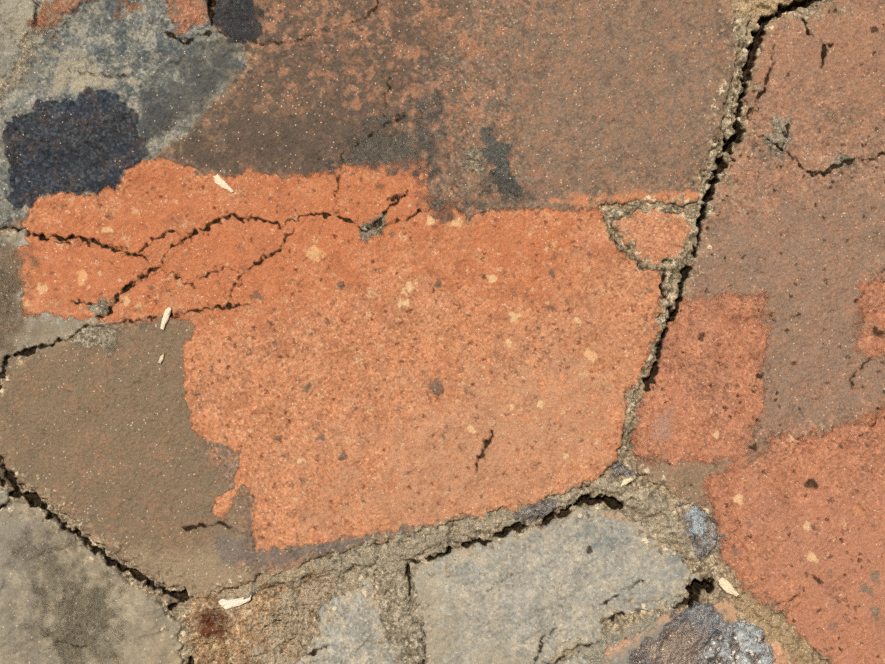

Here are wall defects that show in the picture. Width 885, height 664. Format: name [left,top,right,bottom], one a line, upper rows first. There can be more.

crack [0,77,425,390]
crack [643,0,885,392]
crack [0,456,189,610]
crack [182,521,232,531]